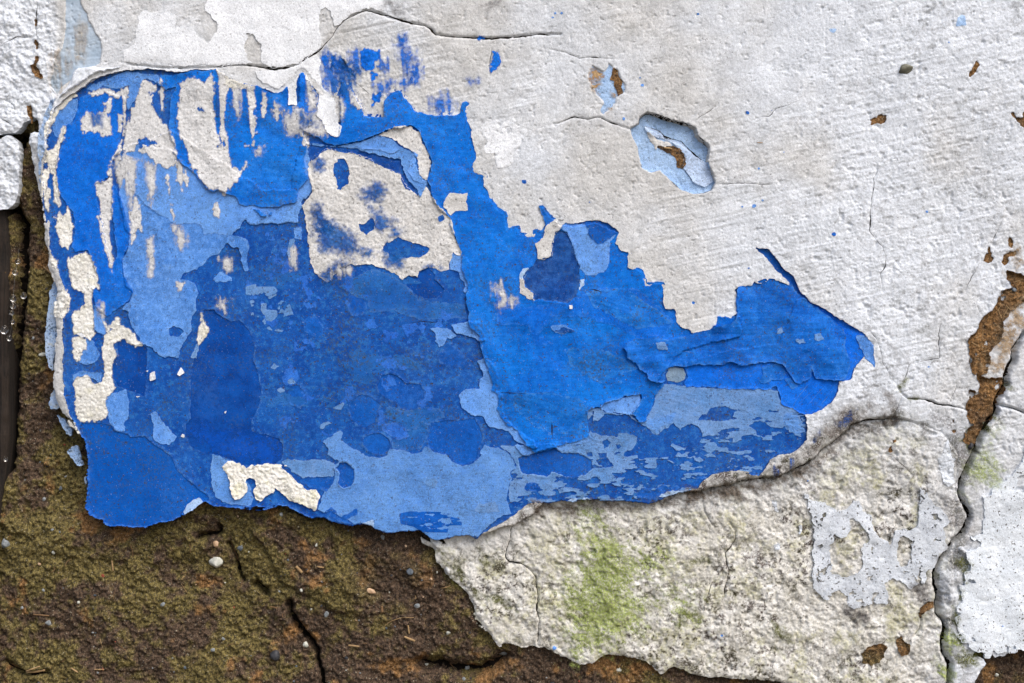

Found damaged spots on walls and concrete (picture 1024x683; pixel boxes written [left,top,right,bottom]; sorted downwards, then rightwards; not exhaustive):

crack [216,10,607,97]
peeling [10,0,875,543]
spalling [938,237,1024,487]
crack [505,530,540,642]
crack [706,320,1022,677]